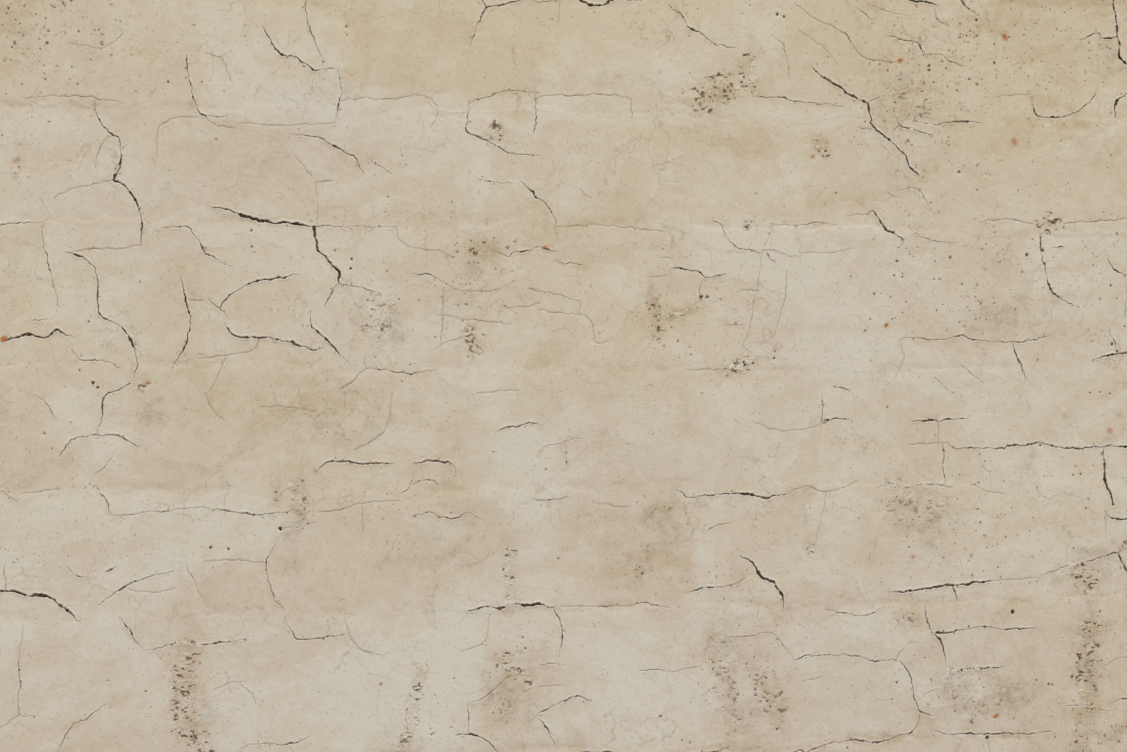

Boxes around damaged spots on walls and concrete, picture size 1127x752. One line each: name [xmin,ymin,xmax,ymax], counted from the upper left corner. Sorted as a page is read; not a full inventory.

crack [156,0,436,184]
crack [465,90,632,156]
crack [700,0,978,370]
crack [1032,93,1126,118]
crack [1079,0,1126,64]
crack [0,95,340,640]
crack [173,207,599,469]
crack [328,460,467,526]
crack [688,555,784,608]
crack [680,483,853,536]
crack [782,371,1127,752]
crack [469,602,662,746]